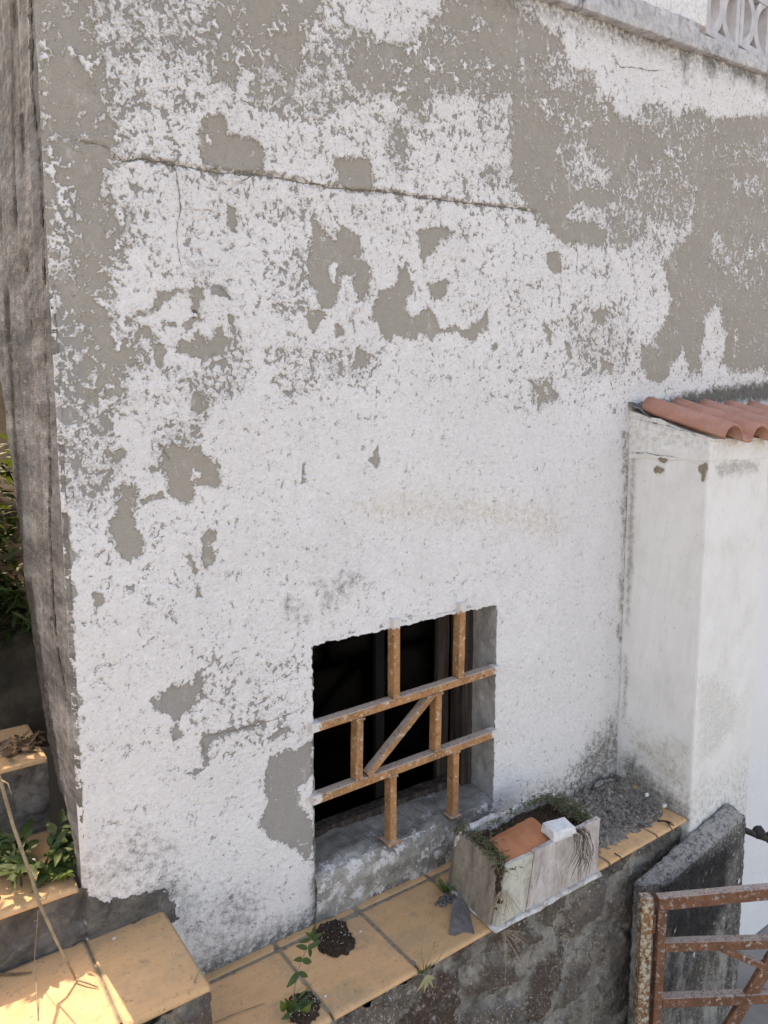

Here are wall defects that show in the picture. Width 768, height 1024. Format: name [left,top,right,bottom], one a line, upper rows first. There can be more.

peeling [205,0,324,84]
peeling [34,0,234,403]
peeling [198,114,264,175]
peeling [226,204,239,233]
crack [82,141,534,268]
peeling [334,0,768,383]
peeling [304,218,488,342]
peeling [191,392,208,415]
peeling [106,441,221,561]
peeling [149,671,205,741]
peeling [189,720,313,860]
water stain [555,722,686,813]